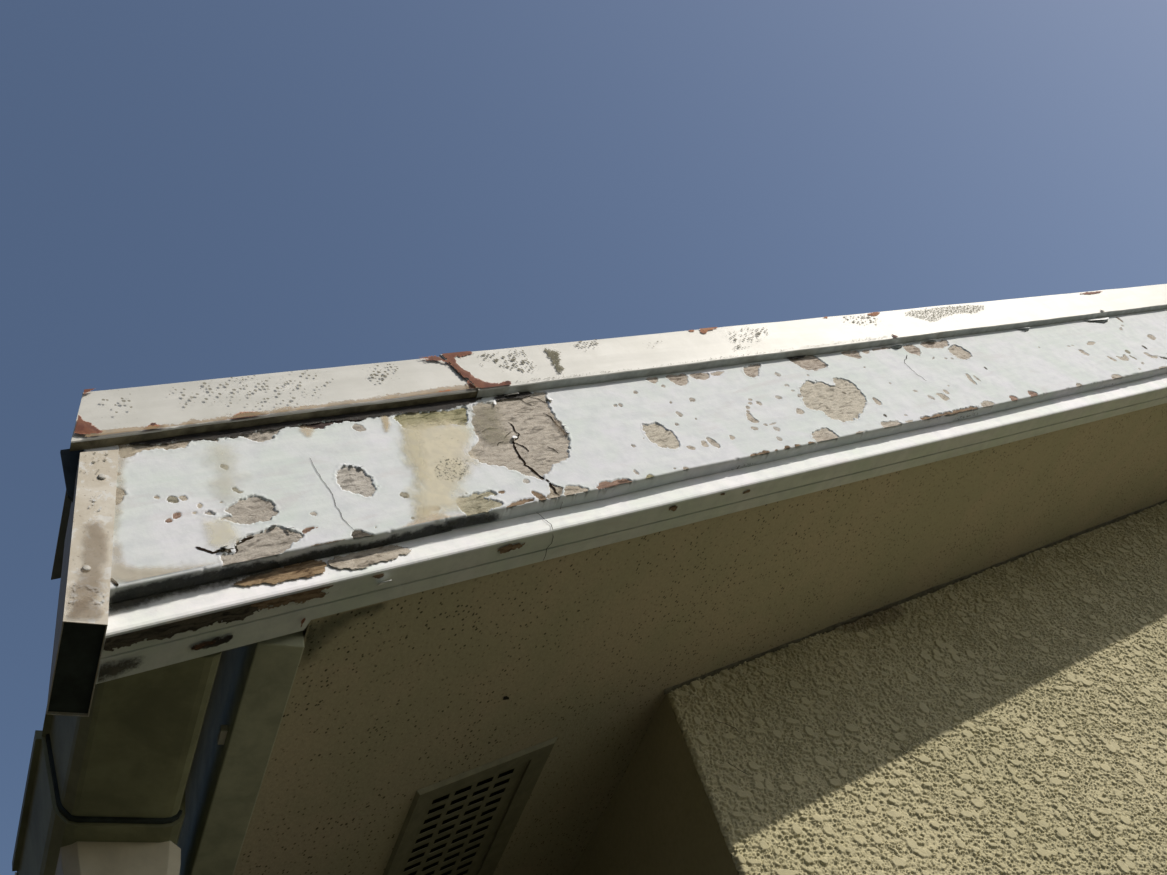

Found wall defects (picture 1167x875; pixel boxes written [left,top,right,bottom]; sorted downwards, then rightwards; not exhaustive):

rust [74,351,511,437]
peeling [631,401,735,450]
peeling [646,371,724,388]
peeling [743,364,760,378]
peeling [746,355,994,456]
peeling [841,339,972,368]
peeling [1107,334,1167,379]
peeling [115,473,125,505]
peeling [118,392,653,516]
crack [483,397,567,560]
peeling [103,487,412,651]
peeling [498,543,525,554]